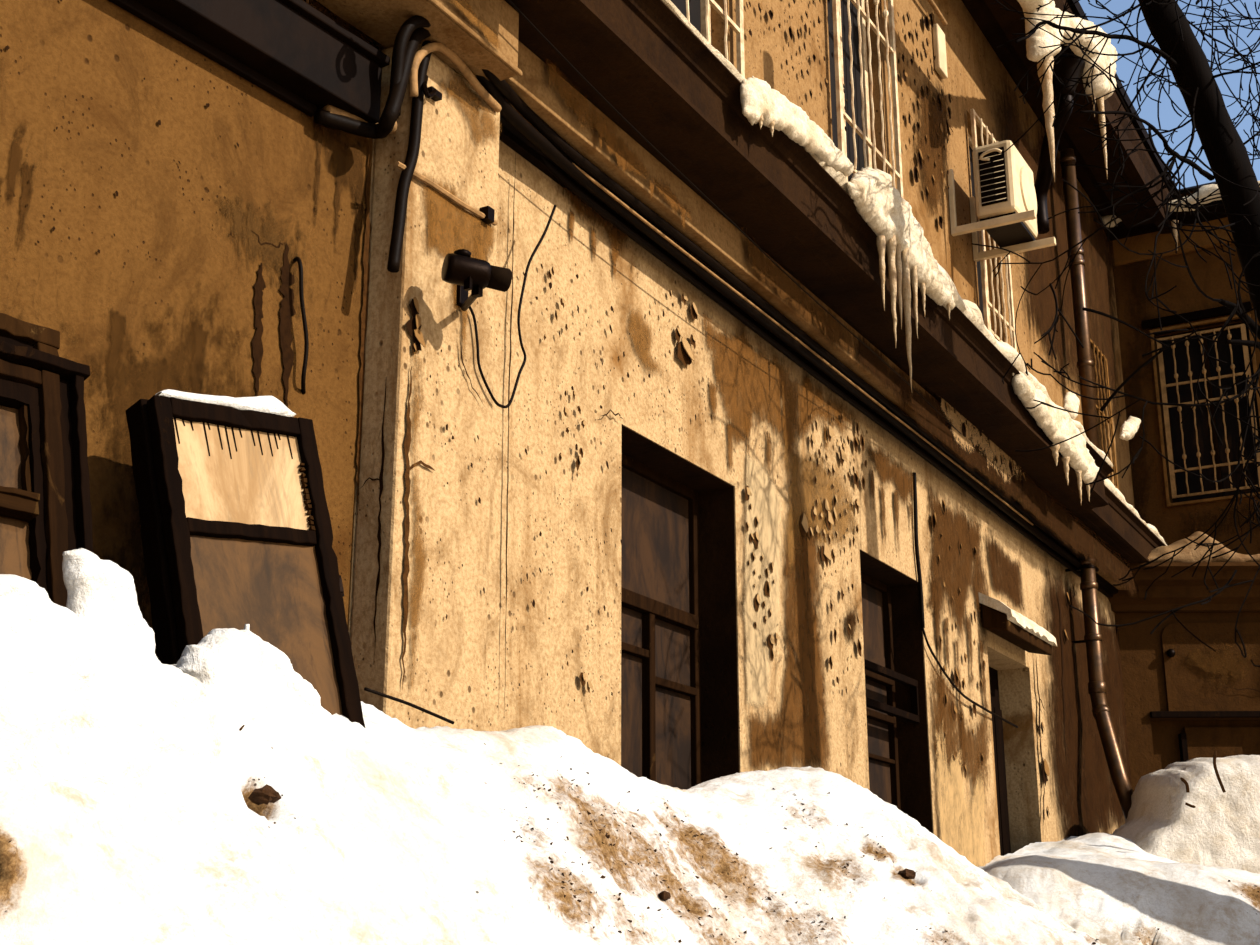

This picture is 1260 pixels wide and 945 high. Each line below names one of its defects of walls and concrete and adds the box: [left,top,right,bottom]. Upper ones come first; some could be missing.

leakage [0,125,34,240]
leakage [217,197,313,316]
leakage [314,124,365,281]
peeling [743,456,781,706]
leakage [702,314,858,771]
peeling [800,413,868,576]
peeling [829,584,862,693]
leakage [928,488,1025,823]